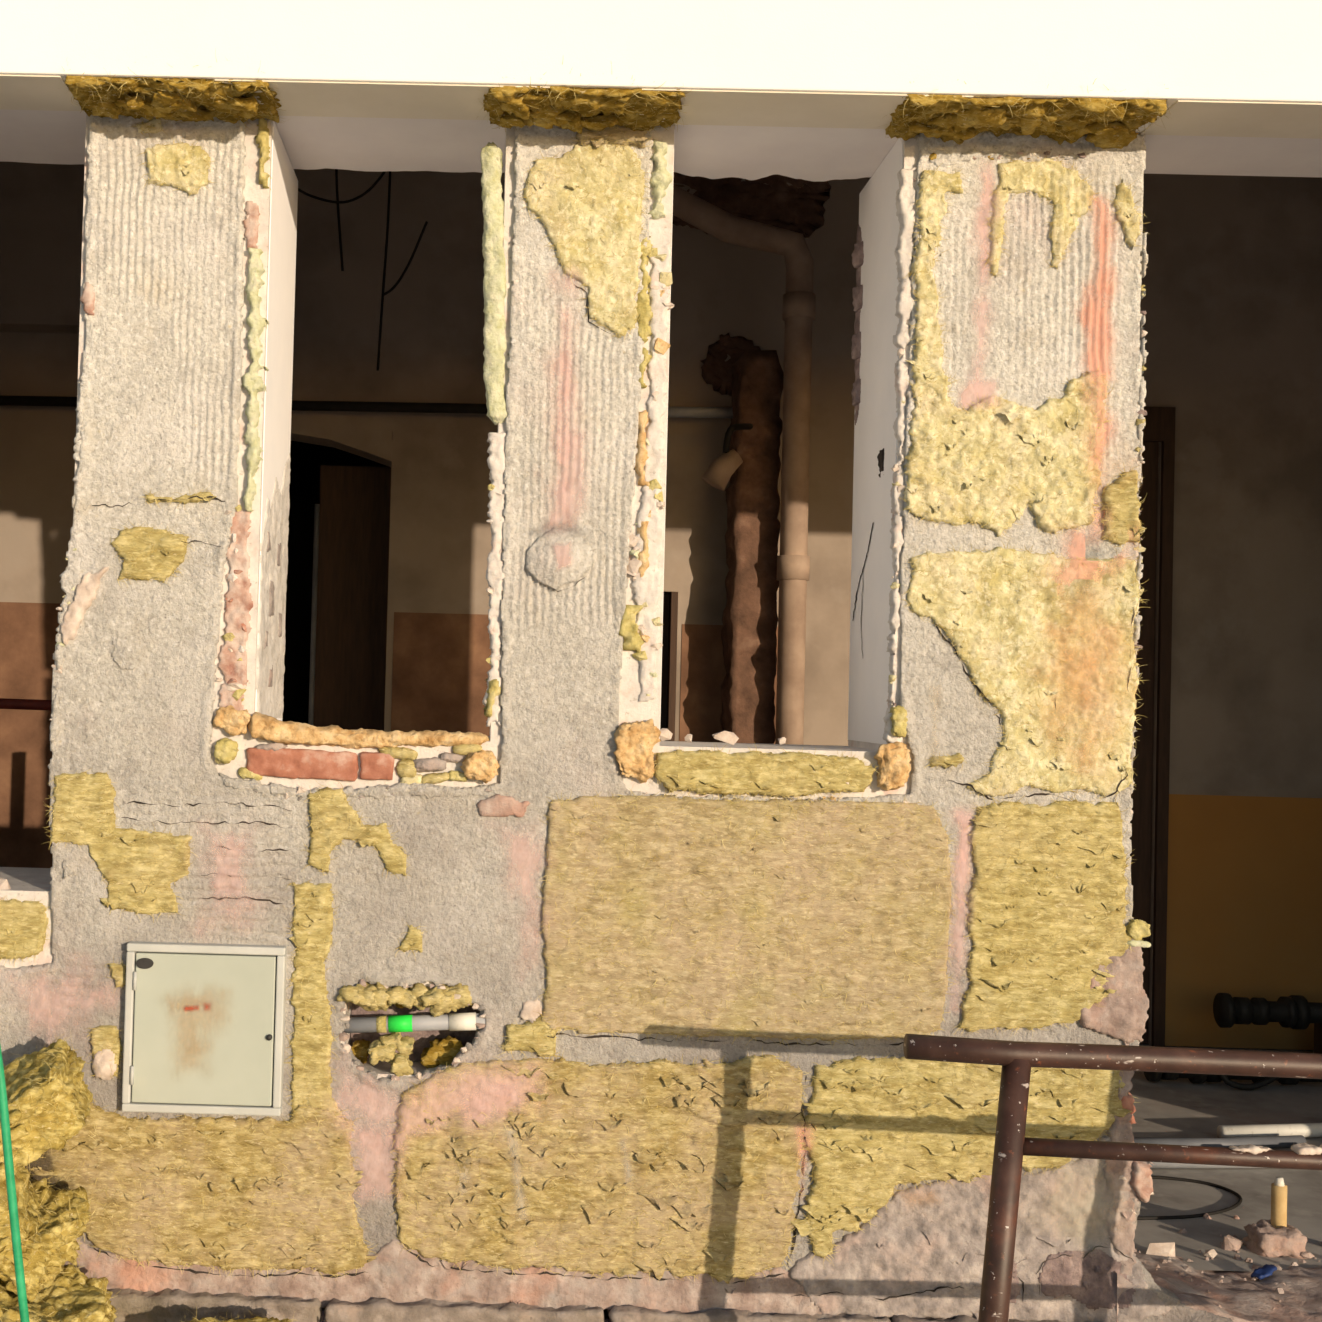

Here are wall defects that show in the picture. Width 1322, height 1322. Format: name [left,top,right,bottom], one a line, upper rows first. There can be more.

flaking render [883,106,1139,743]
flaking render [1122,232,1148,677]
flaking render [1108,726,1137,793]
spalling [322,979,486,1081]
peeling [976,978,1013,1001]
flaking render [1079,939,1149,1045]
peeling [30,1132,179,1177]
peeling [472,1065,711,1232]
peeling [671,1074,772,1110]
peeling [803,1103,884,1162]
peeling [843,1068,999,1111]
flaking render [62,1135,992,1320]